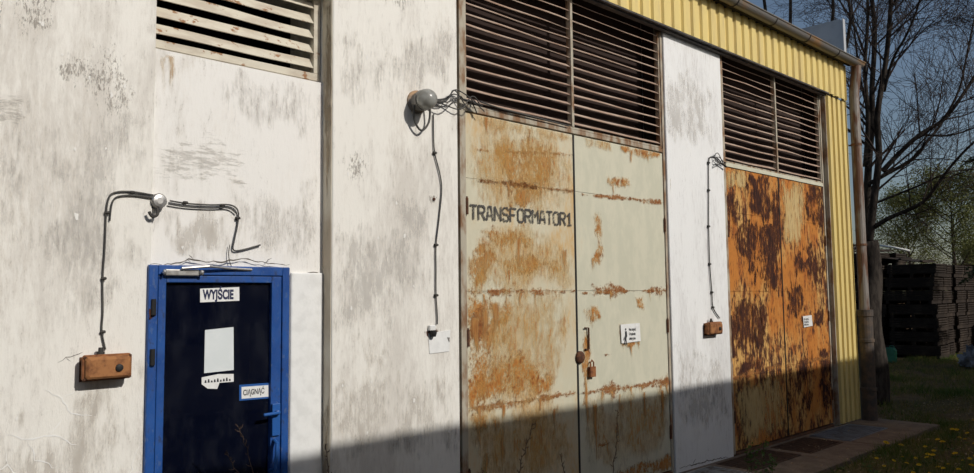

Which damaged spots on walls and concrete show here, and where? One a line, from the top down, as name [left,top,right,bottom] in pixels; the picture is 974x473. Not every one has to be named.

rust [468,229,671,473]
rust [592,216,603,267]
rust [726,171,832,440]